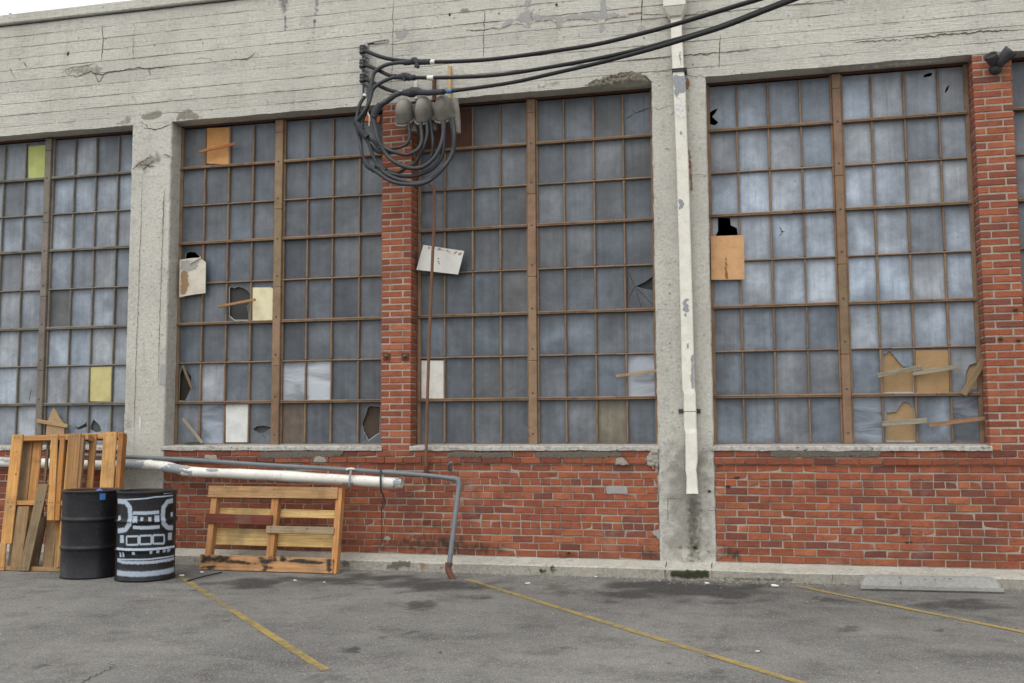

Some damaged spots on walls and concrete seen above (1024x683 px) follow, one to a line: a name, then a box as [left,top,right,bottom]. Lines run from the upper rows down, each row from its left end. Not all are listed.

crack [854,29,1023,43]
crack [63,24,171,82]
spalling [585,71,648,87]
peeling [127,110,161,122]